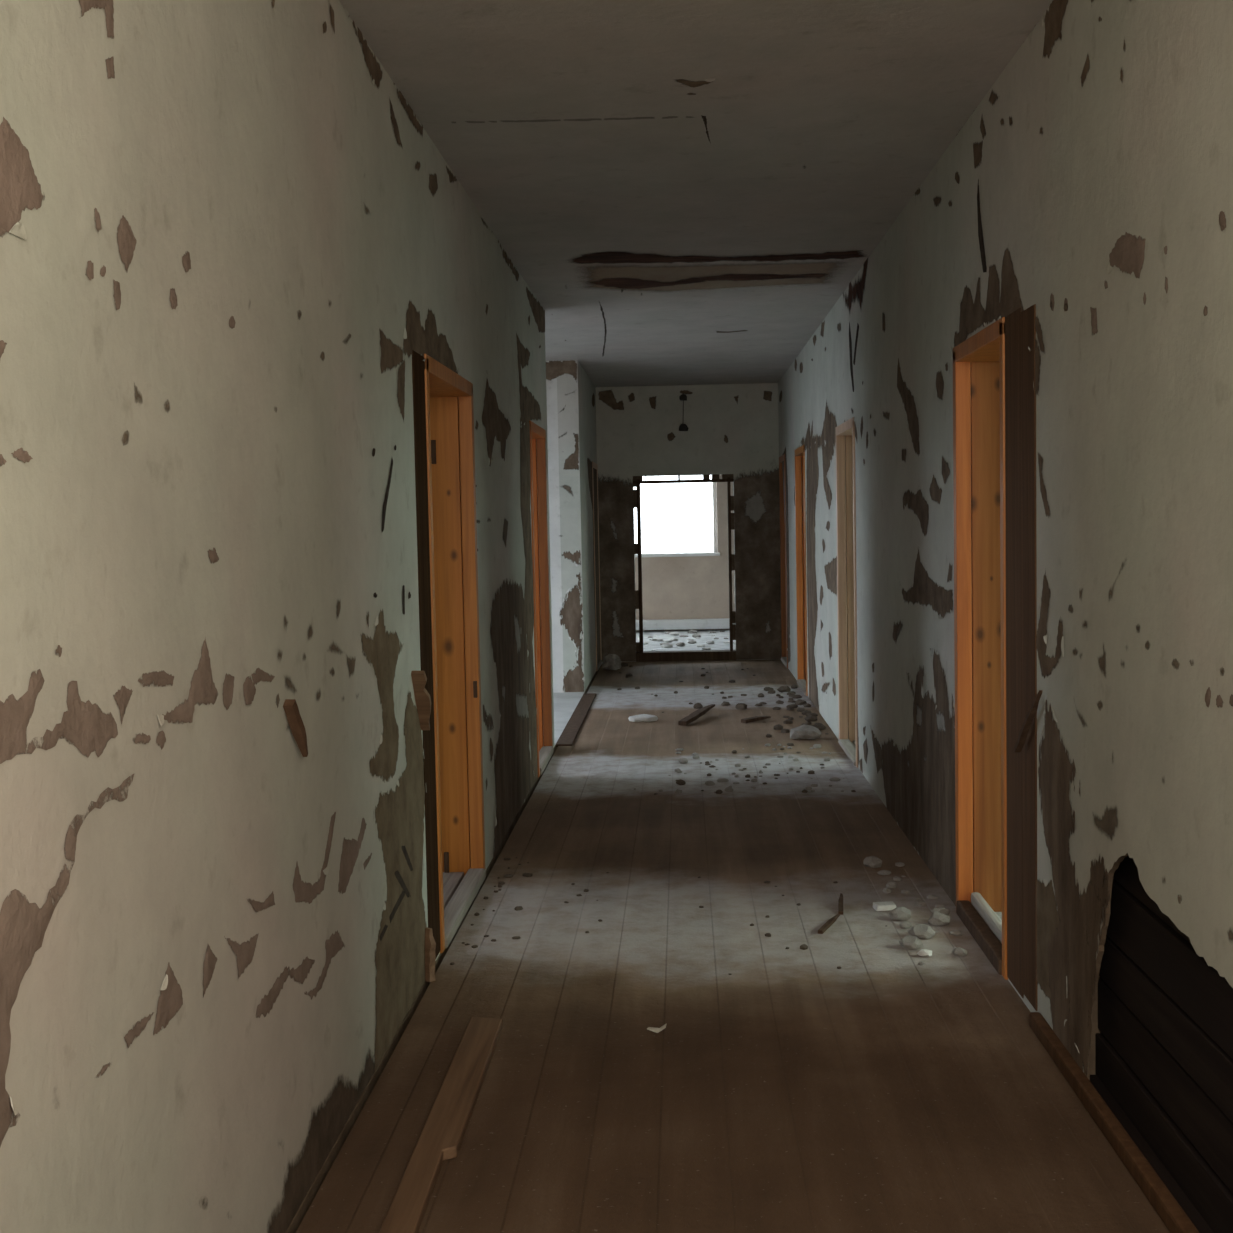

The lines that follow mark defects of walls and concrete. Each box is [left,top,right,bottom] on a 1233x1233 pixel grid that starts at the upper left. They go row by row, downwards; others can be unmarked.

peeling [0,116,45,240]
peeling [379,300,460,420]
peeling [936,248,1044,399]
peeling [475,218,545,856]
peeling [900,457,953,618]
peeling [0,669,174,764]
peeling [134,638,295,749]
peeling [293,609,427,1072]
peeling [857,648,956,906]
peeling [0,774,134,1146]
peeling [124,962,183,1048]
spalling [1036,700,1233,1233]